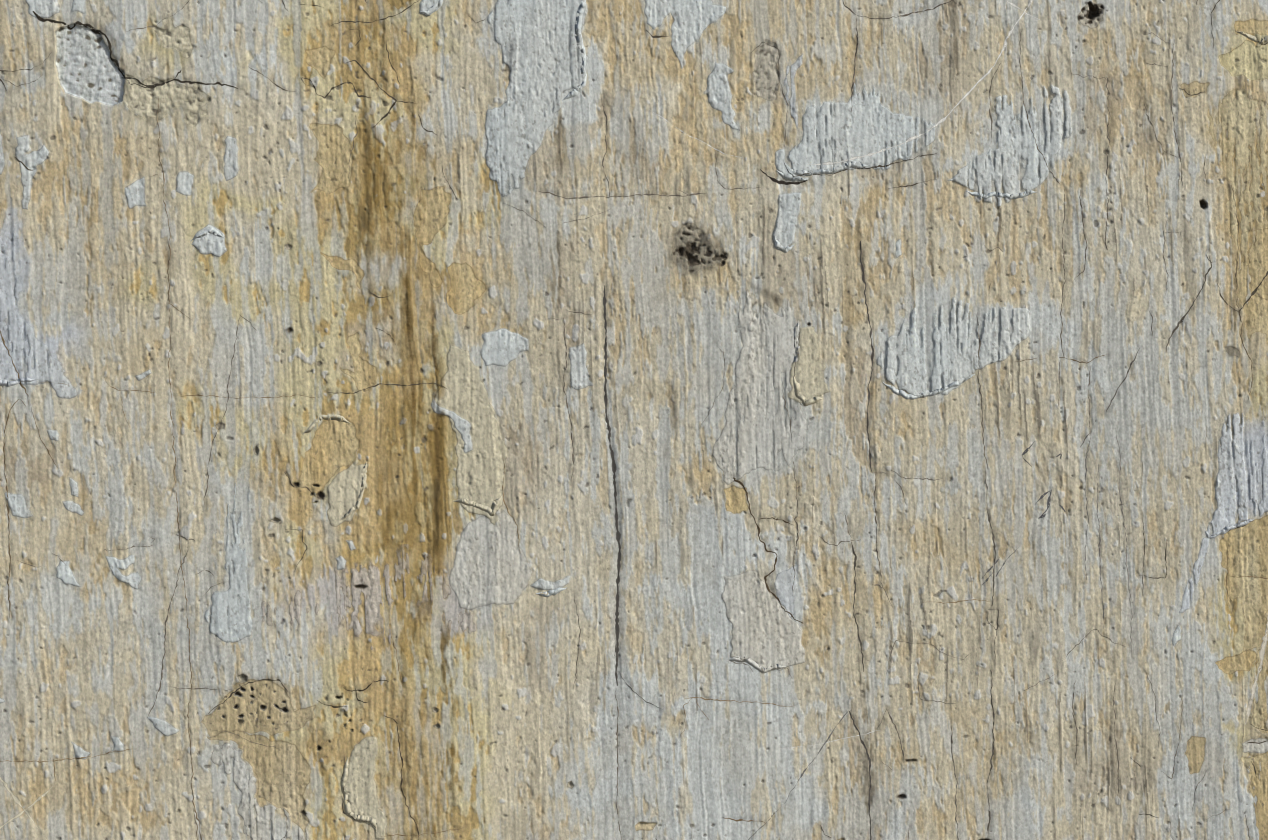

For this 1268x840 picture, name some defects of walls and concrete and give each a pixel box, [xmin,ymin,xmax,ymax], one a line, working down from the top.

spalling [26,0,211,126]
peeling [485,0,588,196]
peeling [776,55,936,182]
crack [843,0,954,112]
peeling [950,85,1072,206]
crack [0,331,67,618]
crack [562,286,792,840]
crack [733,241,999,840]
peeling [877,297,1031,399]
crack [989,31,1268,764]
peeling [1206,413,1268,840]
crack [1113,675,1250,839]